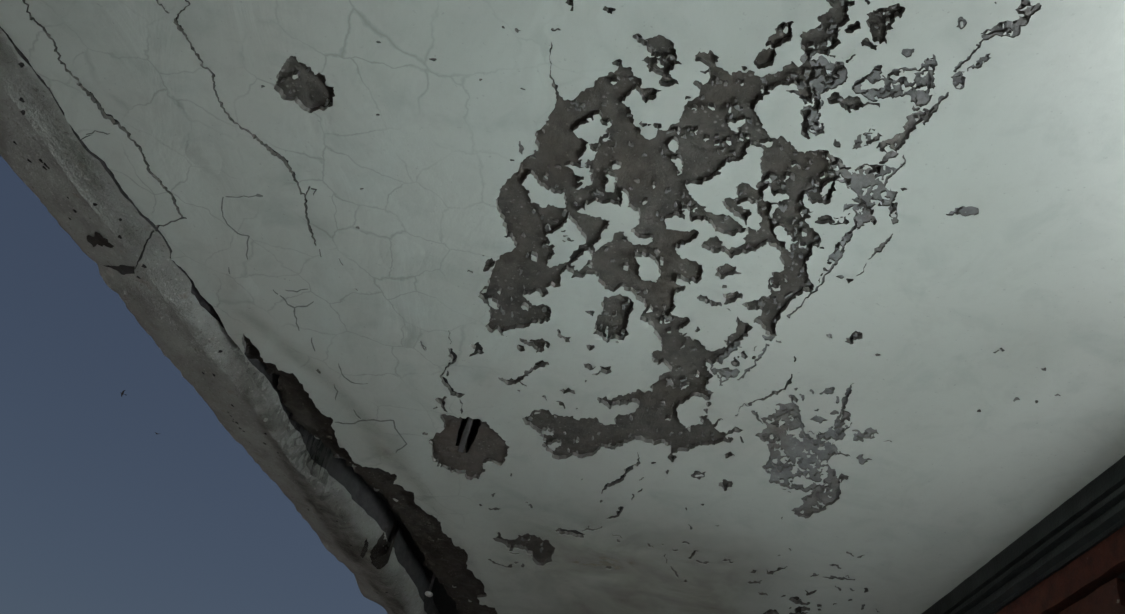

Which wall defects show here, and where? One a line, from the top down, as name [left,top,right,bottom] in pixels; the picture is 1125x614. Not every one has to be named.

crack [80,92,131,141]
spalling [262,56,334,109]
crack [221,194,263,274]
spalling [480,0,1041,459]
spalling [244,335,508,614]
peeling [752,385,878,516]
spalling [497,532,555,566]